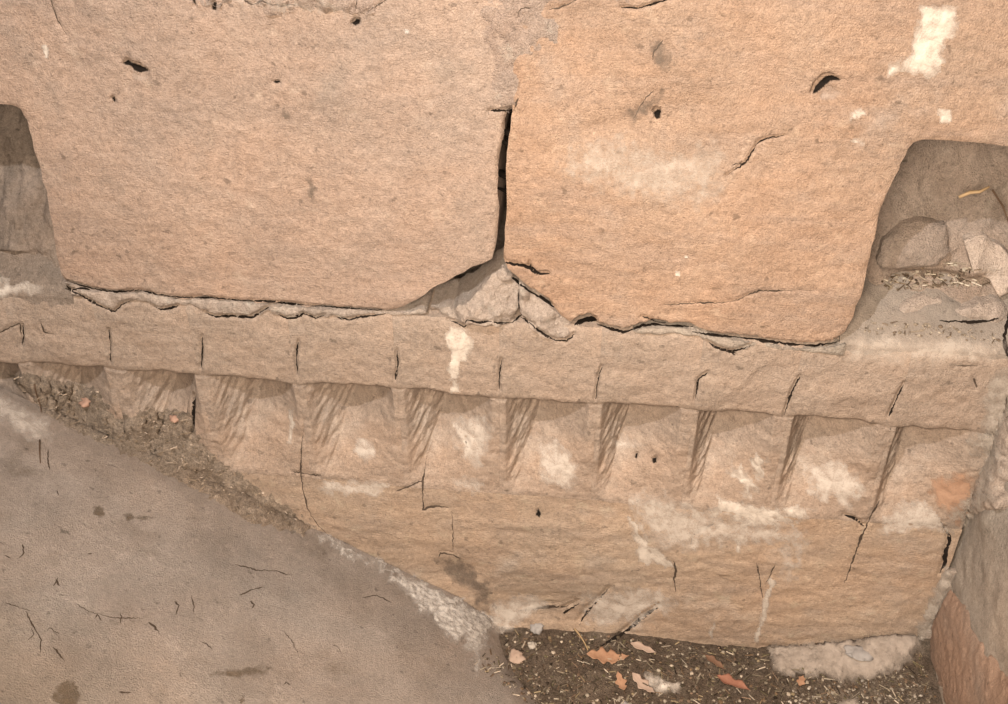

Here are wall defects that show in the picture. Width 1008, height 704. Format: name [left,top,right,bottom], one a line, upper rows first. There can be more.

crack [621,0,666,9]
damp [888,7,956,76]
crack [491,99,518,194]
crack [729,135,783,174]
crack [65,281,386,321]
crack [451,261,840,355]
damp [445,327,474,392]
crack [844,500,880,583]